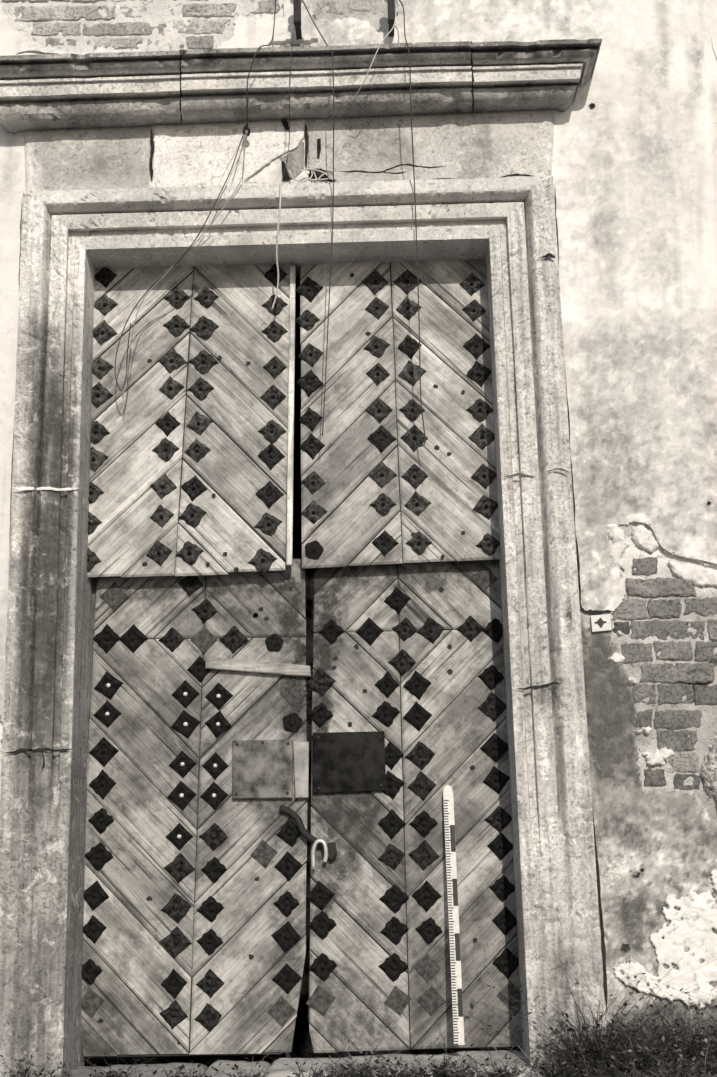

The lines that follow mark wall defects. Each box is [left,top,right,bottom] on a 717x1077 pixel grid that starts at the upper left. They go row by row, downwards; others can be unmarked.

flaking render [0,0,285,54]
crack [147,127,155,181]
crack [302,122,310,169]
crack [344,163,474,179]
crack [541,191,559,265]
crack [504,372,613,615]
peeling [557,580,572,657]
flaking render [606,520,717,822]
peeling [536,708,555,801]
peeling [575,714,584,767]
crack [592,808,607,1007]
peeling [607,865,717,1010]